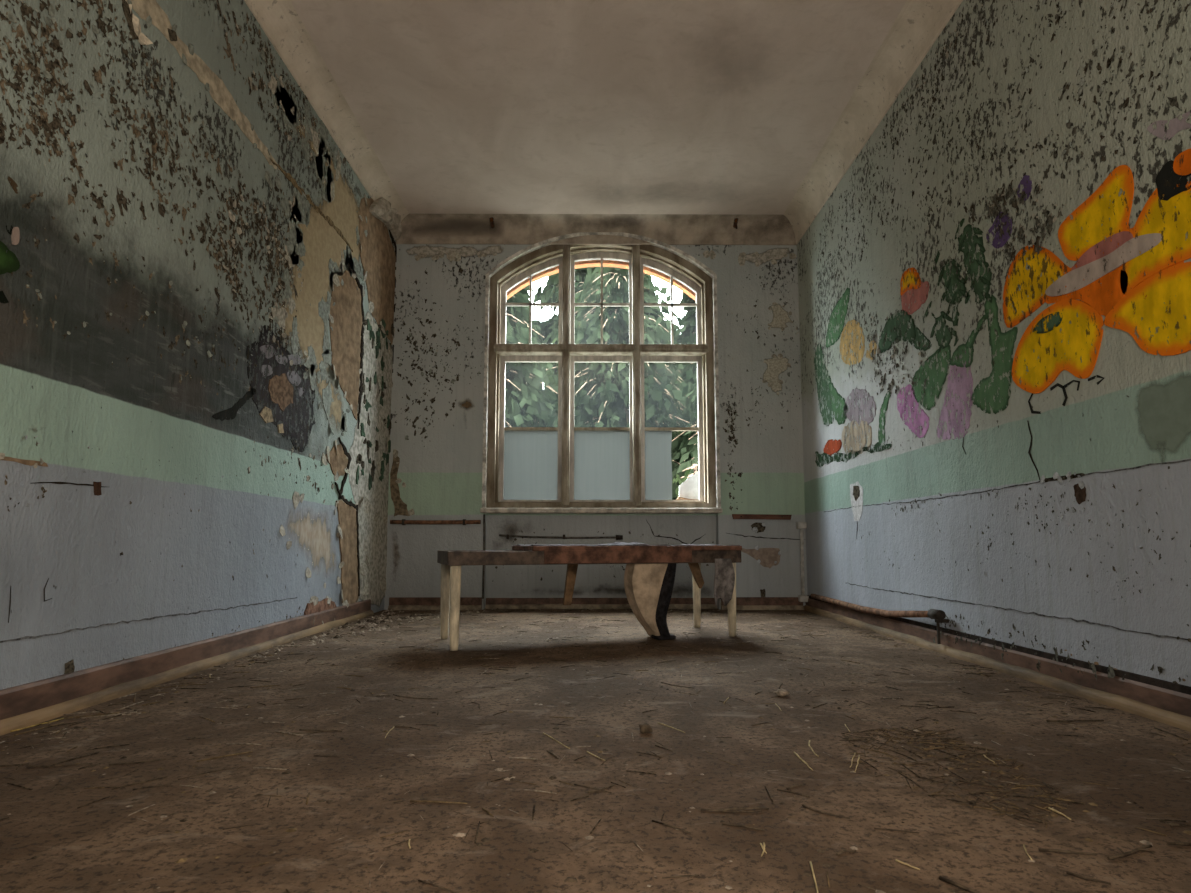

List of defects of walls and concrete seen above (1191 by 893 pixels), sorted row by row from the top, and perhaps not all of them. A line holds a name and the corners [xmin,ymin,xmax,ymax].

peeling [815,0,1191,291]
peeling [0,0,484,625]
crack [0,586,297,643]